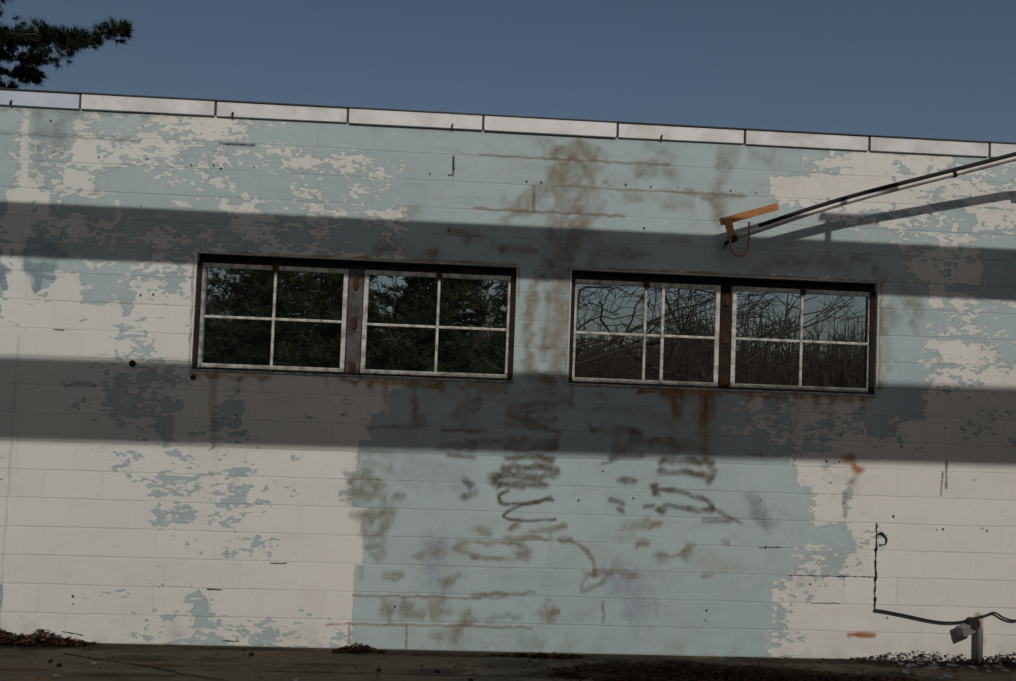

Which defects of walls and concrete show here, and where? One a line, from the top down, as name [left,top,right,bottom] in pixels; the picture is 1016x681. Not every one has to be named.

peeling [0,107,452,559]
peeling [131,380,403,648]
peeling [715,149,1016,658]